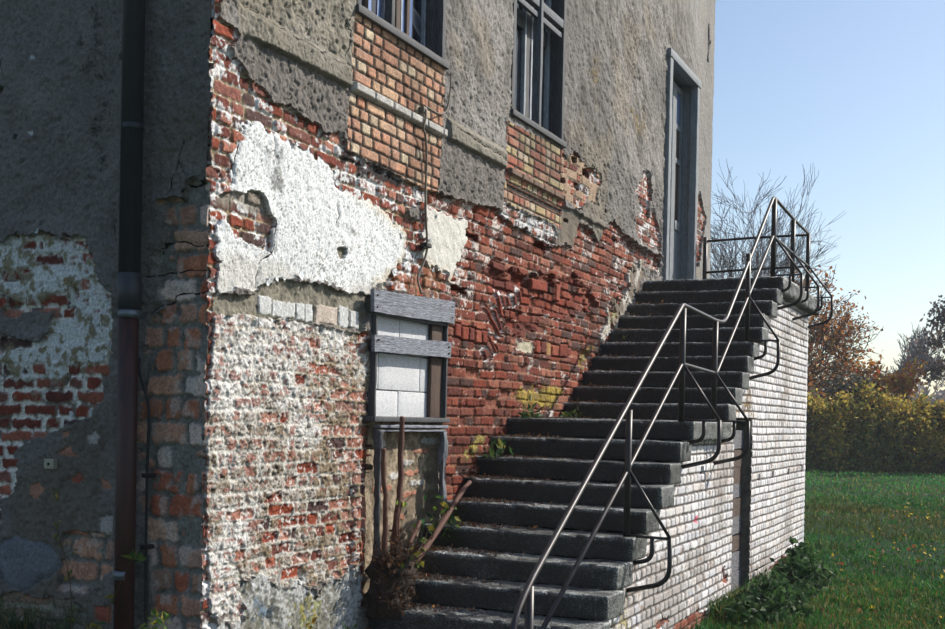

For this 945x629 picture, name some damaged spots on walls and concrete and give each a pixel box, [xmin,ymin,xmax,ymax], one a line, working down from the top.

spalling [0,228,114,523]
peeling [136,0,663,629]
spalling [0,529,115,629]